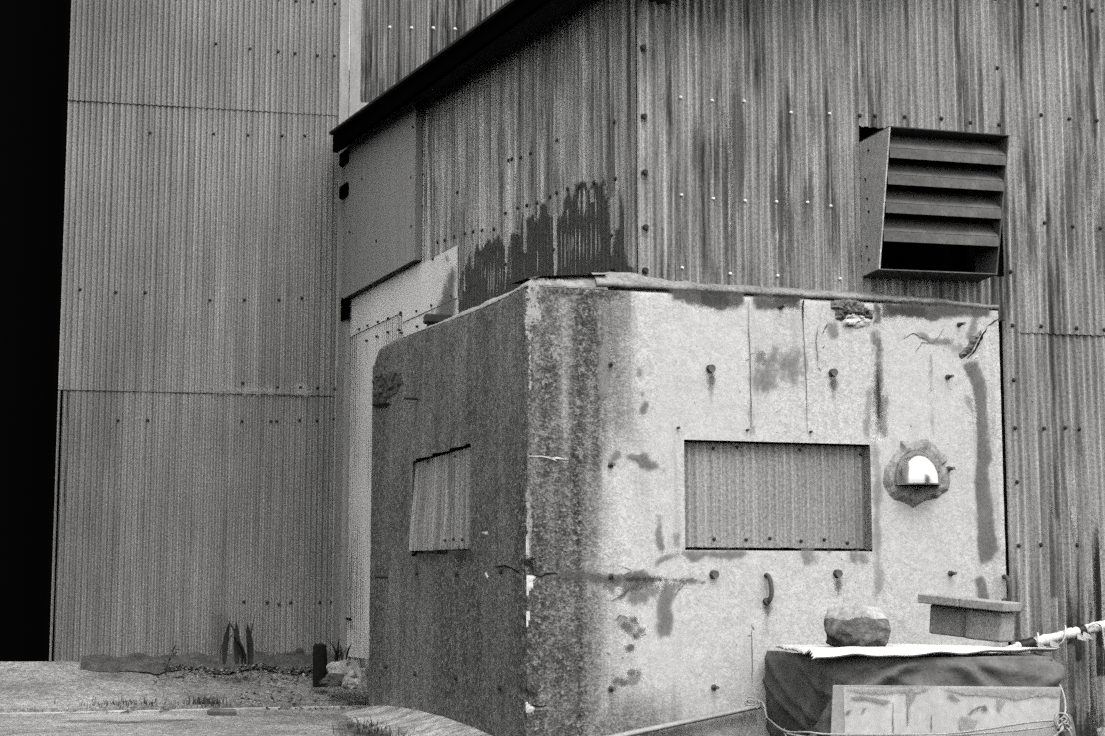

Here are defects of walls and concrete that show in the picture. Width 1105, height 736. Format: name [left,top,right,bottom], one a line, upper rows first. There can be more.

leakage [1060,122,1075,273]
leakage [1086,153,1105,284]
spalling [823,299,874,348]
spalling [372,370,403,408]
leakage [964,361,998,562]
leakage [558,515,746,636]
leakage [976,576,989,599]